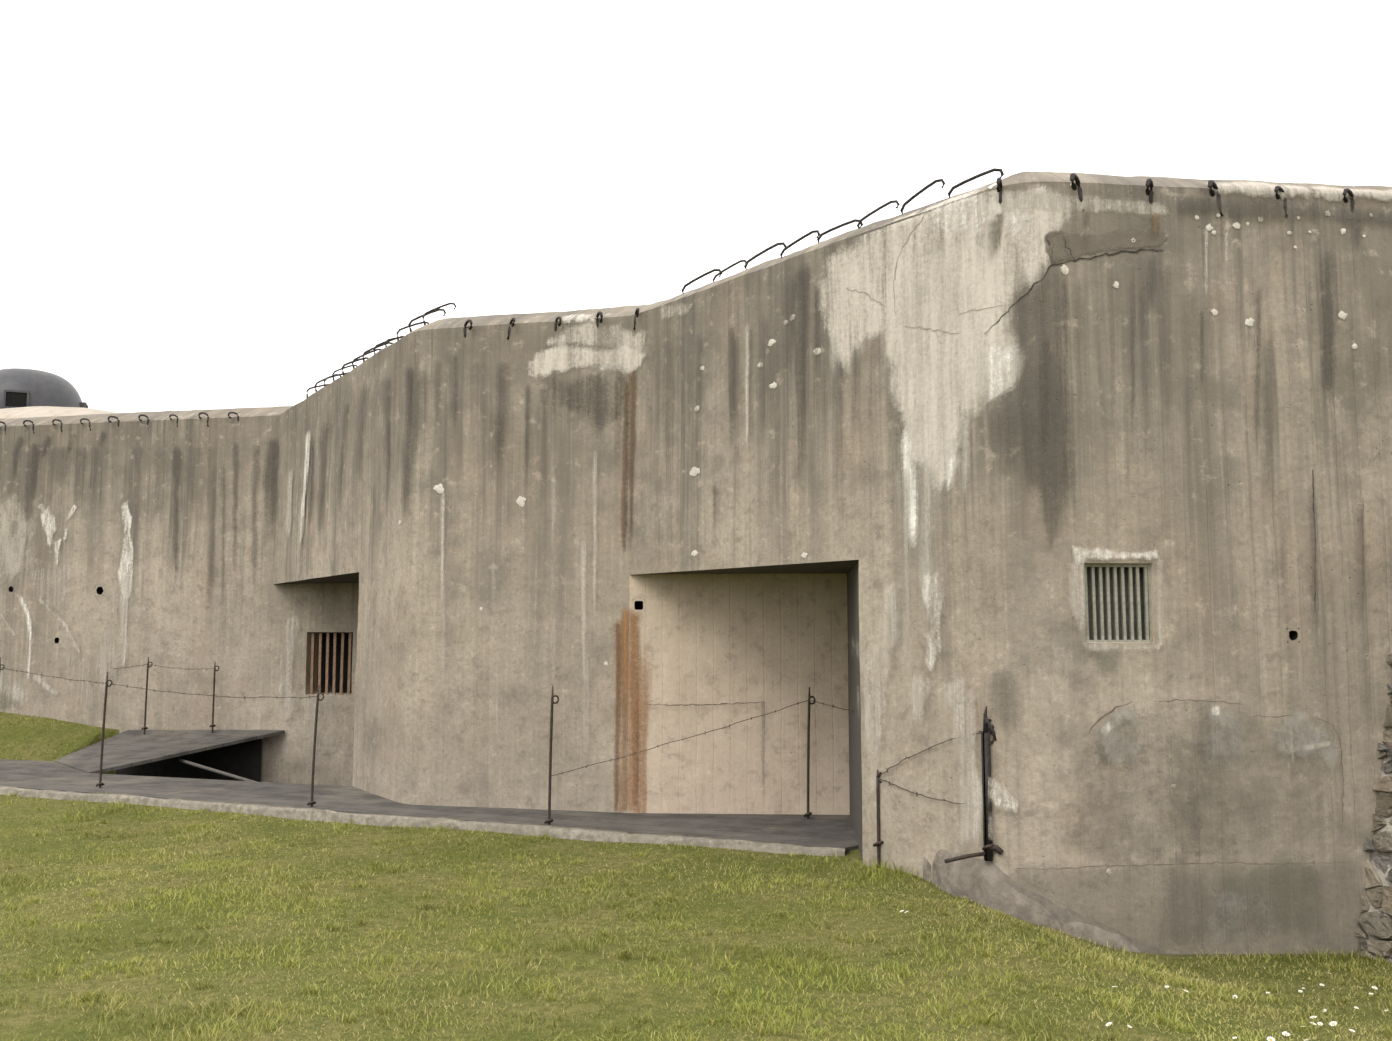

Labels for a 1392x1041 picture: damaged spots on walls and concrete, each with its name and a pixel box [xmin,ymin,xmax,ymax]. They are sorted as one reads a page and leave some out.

water stain [729,318,764,437]
peeling [813,183,1167,662]
crack [846,212,1163,341]
water stain [1255,291,1273,452]
water stain [1179,182,1392,274]
water stain [1324,252,1334,382]
water stain [118,503,133,664]
corrosion [615,610,647,813]
peeling [913,637,936,713]